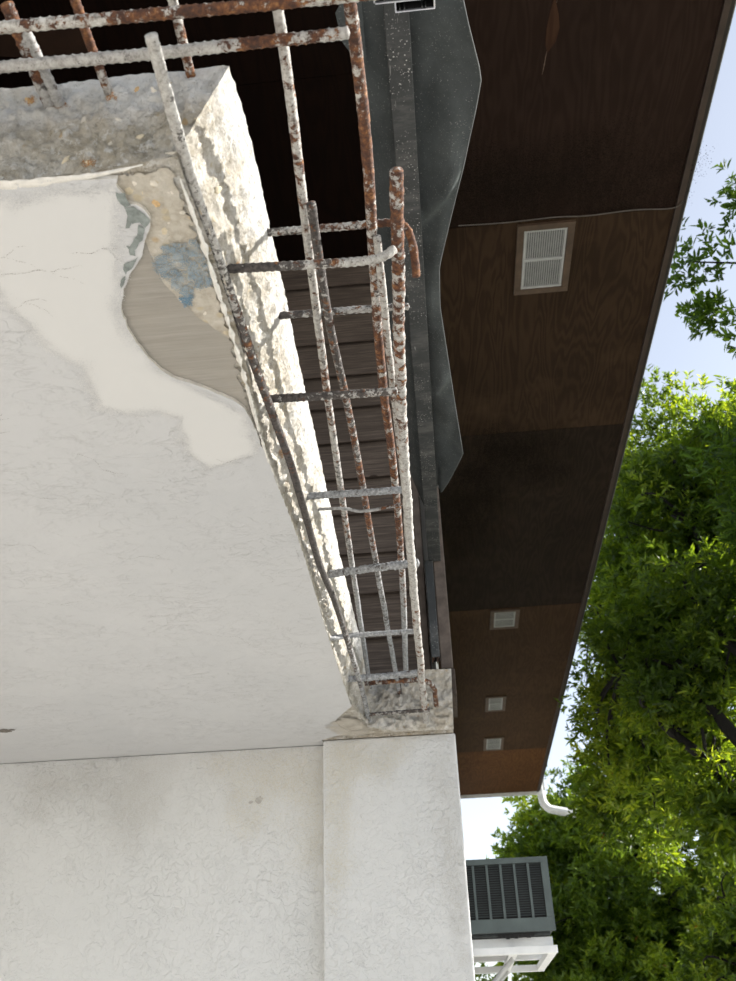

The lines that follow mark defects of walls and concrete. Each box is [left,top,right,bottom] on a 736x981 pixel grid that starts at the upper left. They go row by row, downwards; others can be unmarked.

spalling [0,65,454,737]